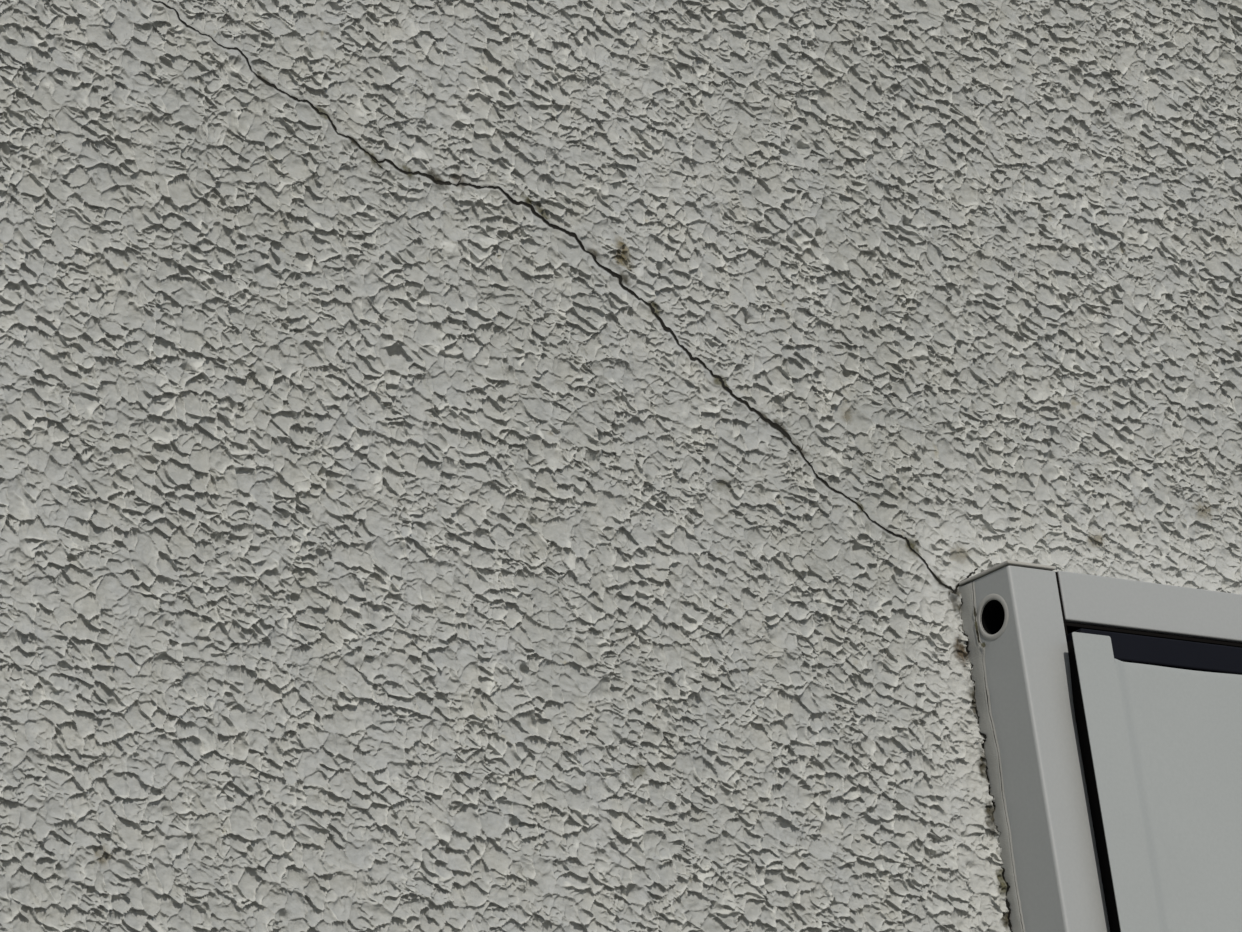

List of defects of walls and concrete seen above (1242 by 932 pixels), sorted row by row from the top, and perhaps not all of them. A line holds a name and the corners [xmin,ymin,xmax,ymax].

crack [152,0,1023,932]